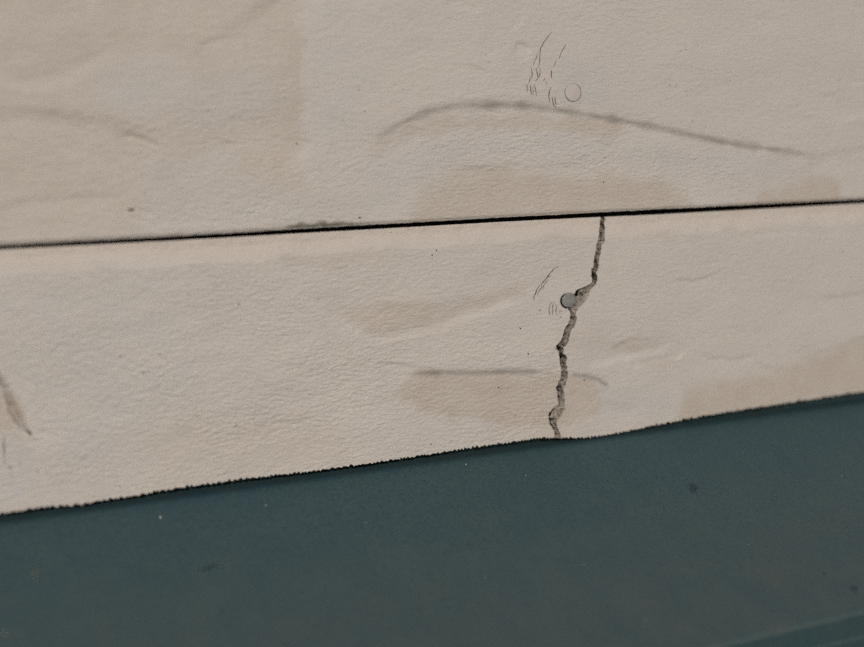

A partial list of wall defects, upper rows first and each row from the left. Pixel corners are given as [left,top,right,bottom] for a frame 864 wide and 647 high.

crack [533,217,606,438]